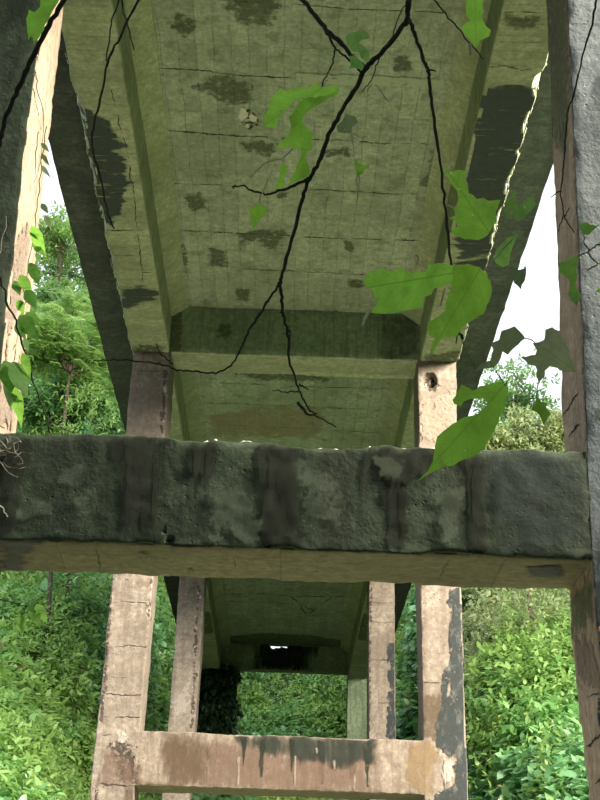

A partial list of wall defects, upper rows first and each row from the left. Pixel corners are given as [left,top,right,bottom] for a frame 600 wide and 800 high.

water stain [192,75,253,105]
spalling [238,108,259,130]
peeling [419,377,457,449]
water stain [0,438,41,576]
water stain [110,436,169,541]
water stain [188,406,321,547]
water stain [423,679,448,740]
water stain [442,749,454,782]